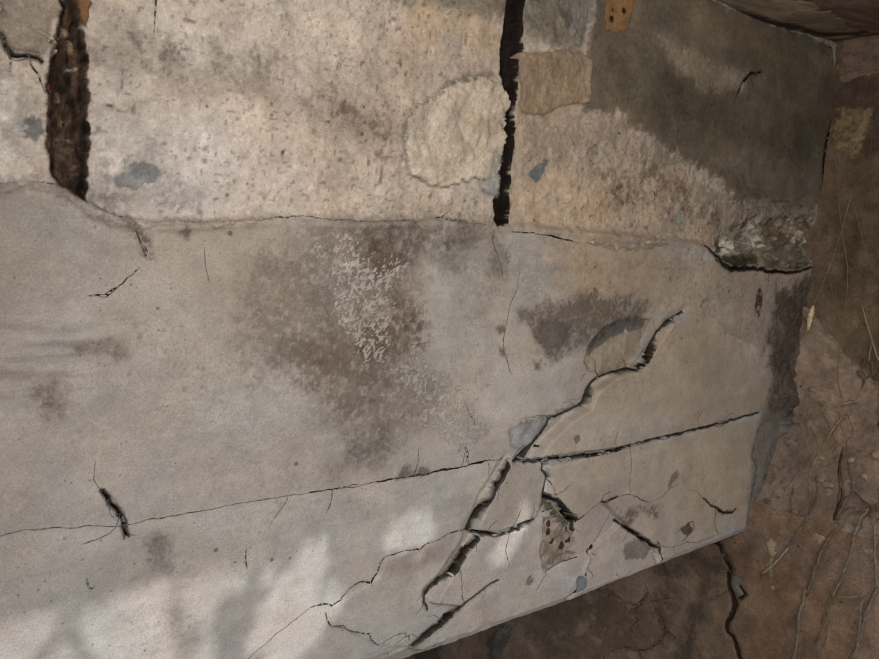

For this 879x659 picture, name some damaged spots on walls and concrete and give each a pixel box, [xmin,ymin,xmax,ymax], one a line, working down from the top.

crack [0,5,59,94]
rust [604,0,634,34]
crack [23,181,148,298]
damp [246,218,496,458]
crack [159,210,662,375]
damp [525,288,647,360]
crack [704,245,813,283]
spalling [715,212,812,271]
crack [0,310,759,659]
spalling [540,515,573,568]